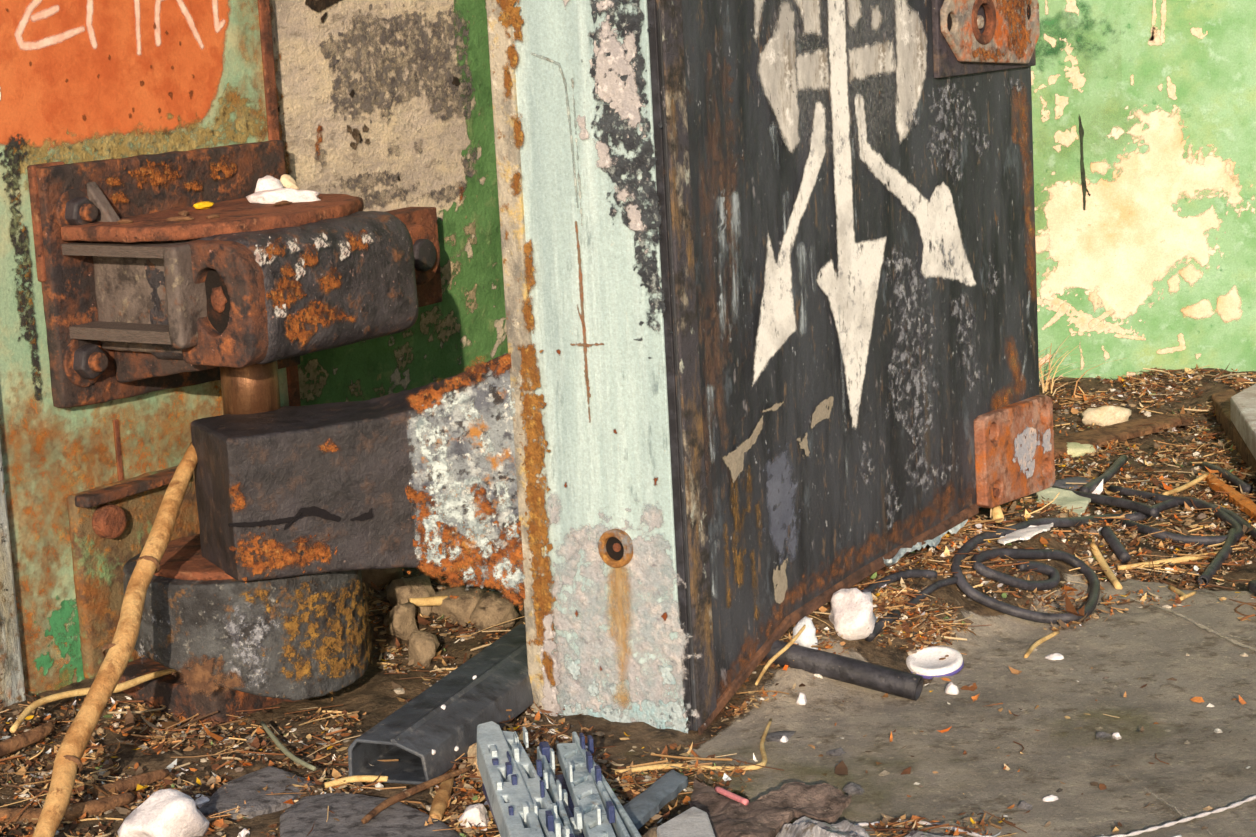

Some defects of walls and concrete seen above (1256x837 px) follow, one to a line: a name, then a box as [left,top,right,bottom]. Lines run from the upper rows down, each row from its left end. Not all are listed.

rust [496,0,524,98]
rust [511,172,521,196]
rust [511,114,524,148]
peeling [576,0,677,341]
peeling [1010,33,1086,153]
peeling [1035,76,1255,331]
peeling [1148,0,1166,46]
rust [265,237,355,345]
rust [1,381,223,697]
peeling [705,402,784,483]
peeling [762,396,834,604]
rust [230,529,373,701]